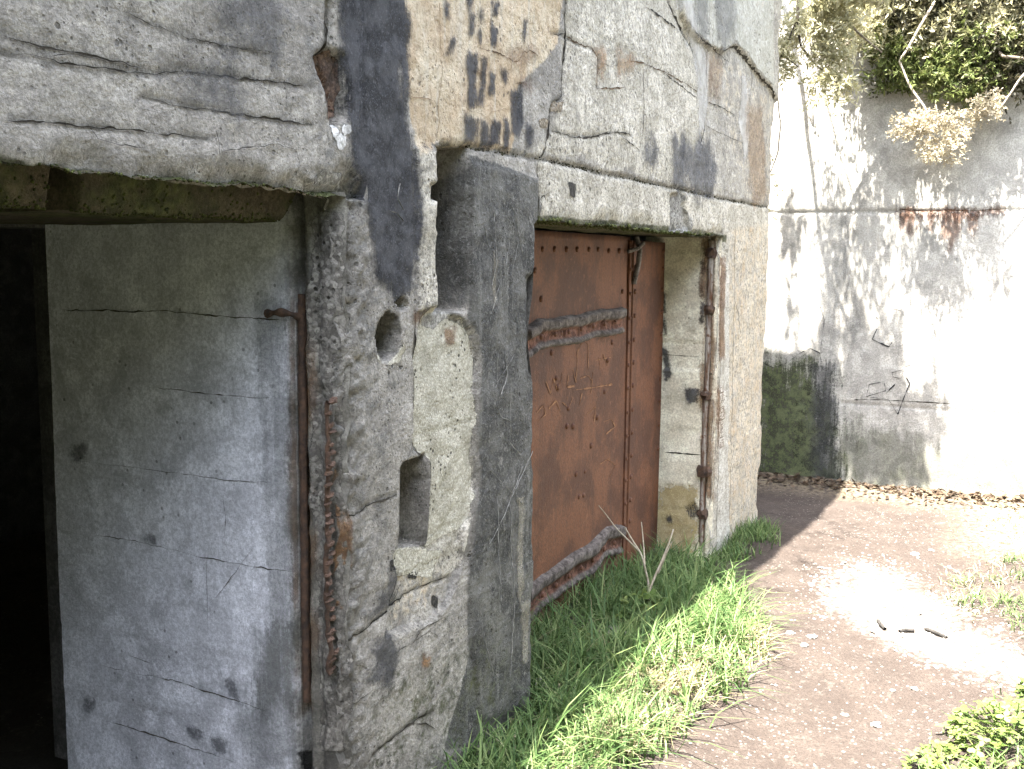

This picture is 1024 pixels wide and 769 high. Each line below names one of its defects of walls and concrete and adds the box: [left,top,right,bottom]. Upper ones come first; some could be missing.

crack [3,12,333,153]
water stain [334,0,426,307]
water stain [463,0,534,150]
water stain [645,134,659,165]
crack [537,0,775,209]
water stain [673,0,717,203]
efflorescence [738,76,749,161]
corrosion [900,207,1005,246]
crack [58,309,279,320]
corrosion [698,237,726,499]
crack [85,461,291,620]
crack [108,721,235,763]